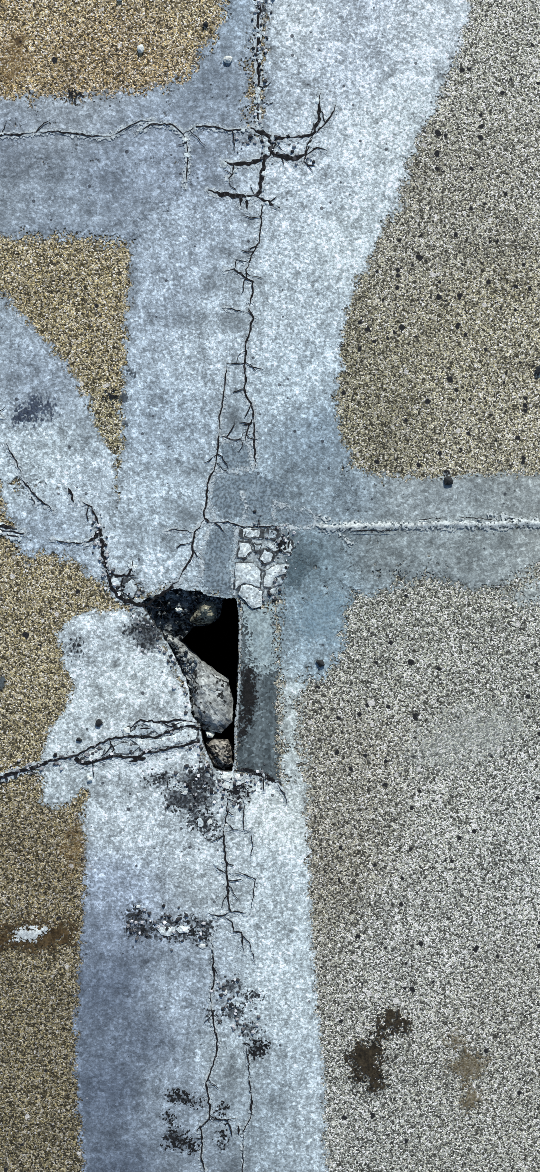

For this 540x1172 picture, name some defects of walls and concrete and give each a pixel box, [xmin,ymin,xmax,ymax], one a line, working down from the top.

crack [0,0,340,611]
crack [0,716,209,788]
peeling [122,438,319,841]
crack [195,773,289,1172]
damp [342,1004,413,1095]